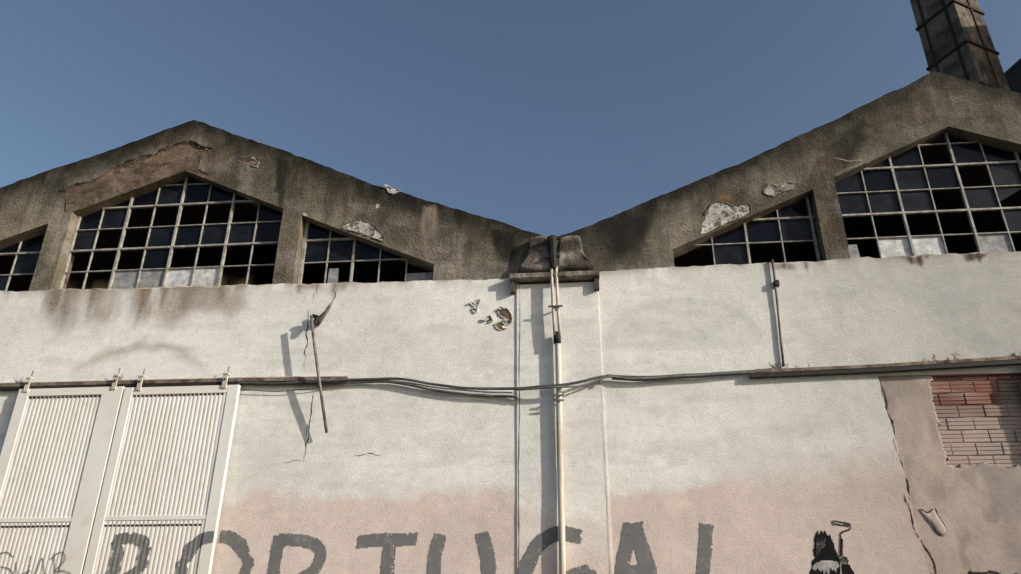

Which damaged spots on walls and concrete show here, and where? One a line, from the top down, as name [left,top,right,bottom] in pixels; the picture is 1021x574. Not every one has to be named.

crack [61,134,214,207]
spalling [763,181,798,197]
spalling [341,219,385,242]
spalling [700,201,752,235]
peeling [469,298,513,331]
flaking render [929,374,1021,468]
crack [879,379,937,574]
crack [970,566,999,574]